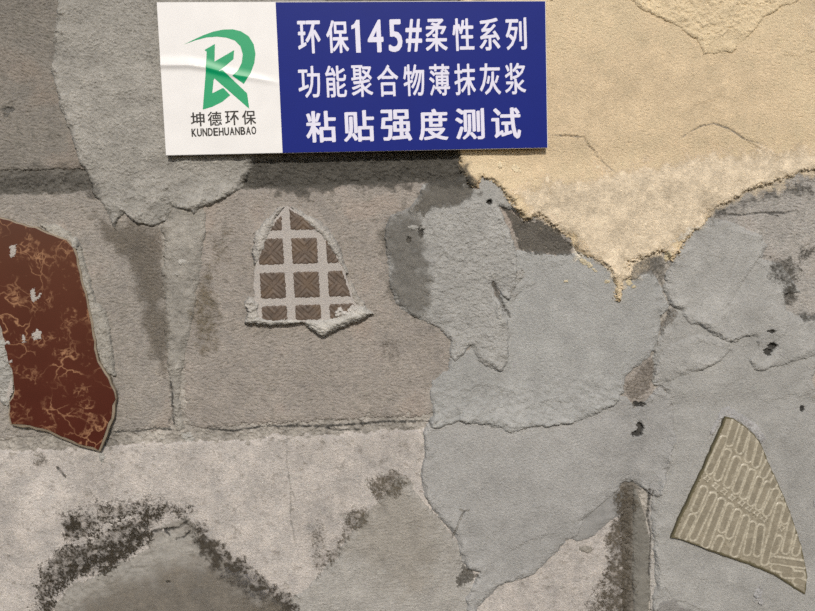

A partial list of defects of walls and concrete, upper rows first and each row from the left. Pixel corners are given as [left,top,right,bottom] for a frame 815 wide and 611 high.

spalling [502,206,572,255]
spalling [631,251,672,289]
spalling [456,566,480,587]